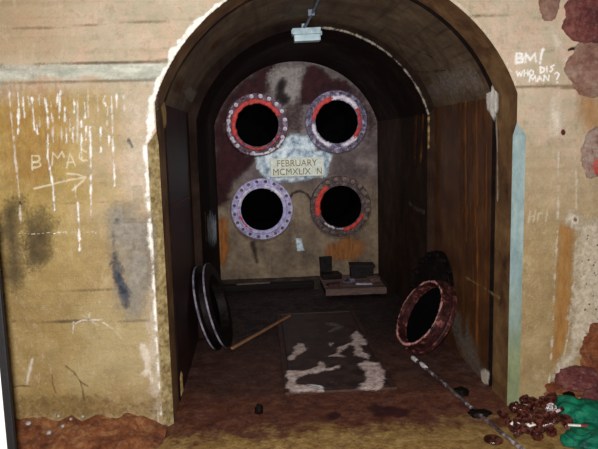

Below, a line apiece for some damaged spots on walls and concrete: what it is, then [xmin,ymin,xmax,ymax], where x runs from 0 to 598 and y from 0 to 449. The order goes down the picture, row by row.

damp [8,90,125,211]
peeling [128,0,226,211]
damp [214,65,375,205]
damp [2,206,67,283]
damp [112,207,152,314]
peeling [147,219,160,393]
corrosion [555,227,572,356]